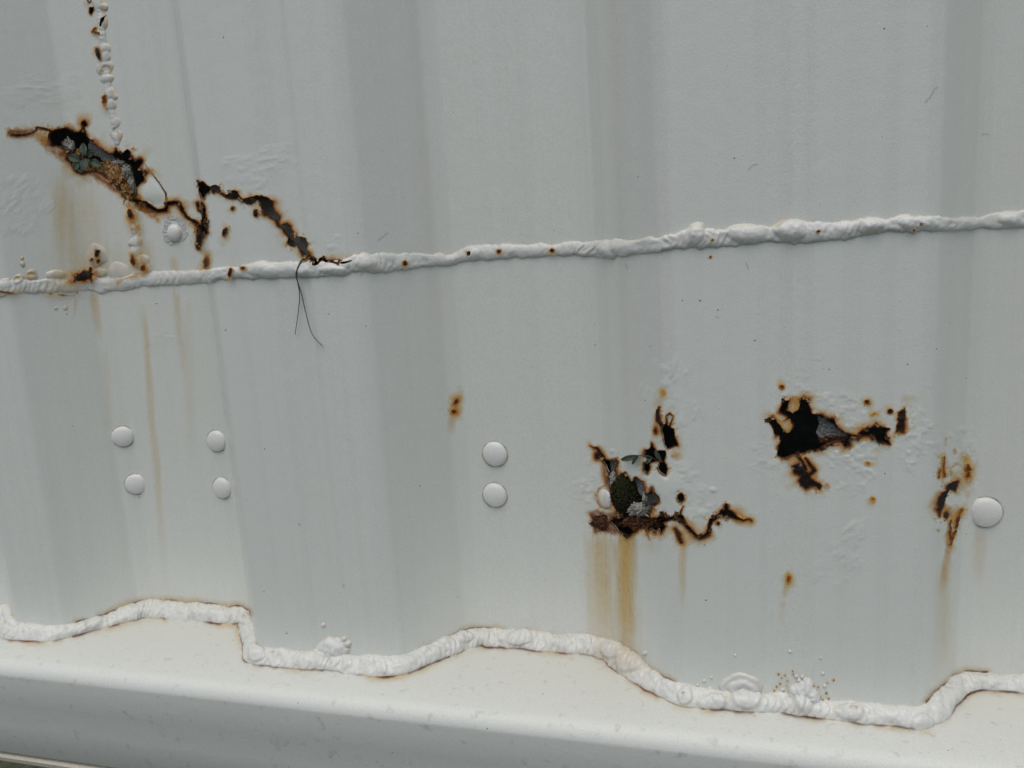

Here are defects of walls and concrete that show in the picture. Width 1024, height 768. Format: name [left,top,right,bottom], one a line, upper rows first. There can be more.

rust [124,193,147,227]
rust [211,188,265,218]
rust [60,249,101,296]
rust [117,250,148,284]
rust [164,201,210,270]
rust [292,232,352,265]
rust [448,395,462,416]
rust [851,398,908,444]
rust [779,442,834,493]
rust [933,450,975,548]
rust [620,528,654,626]